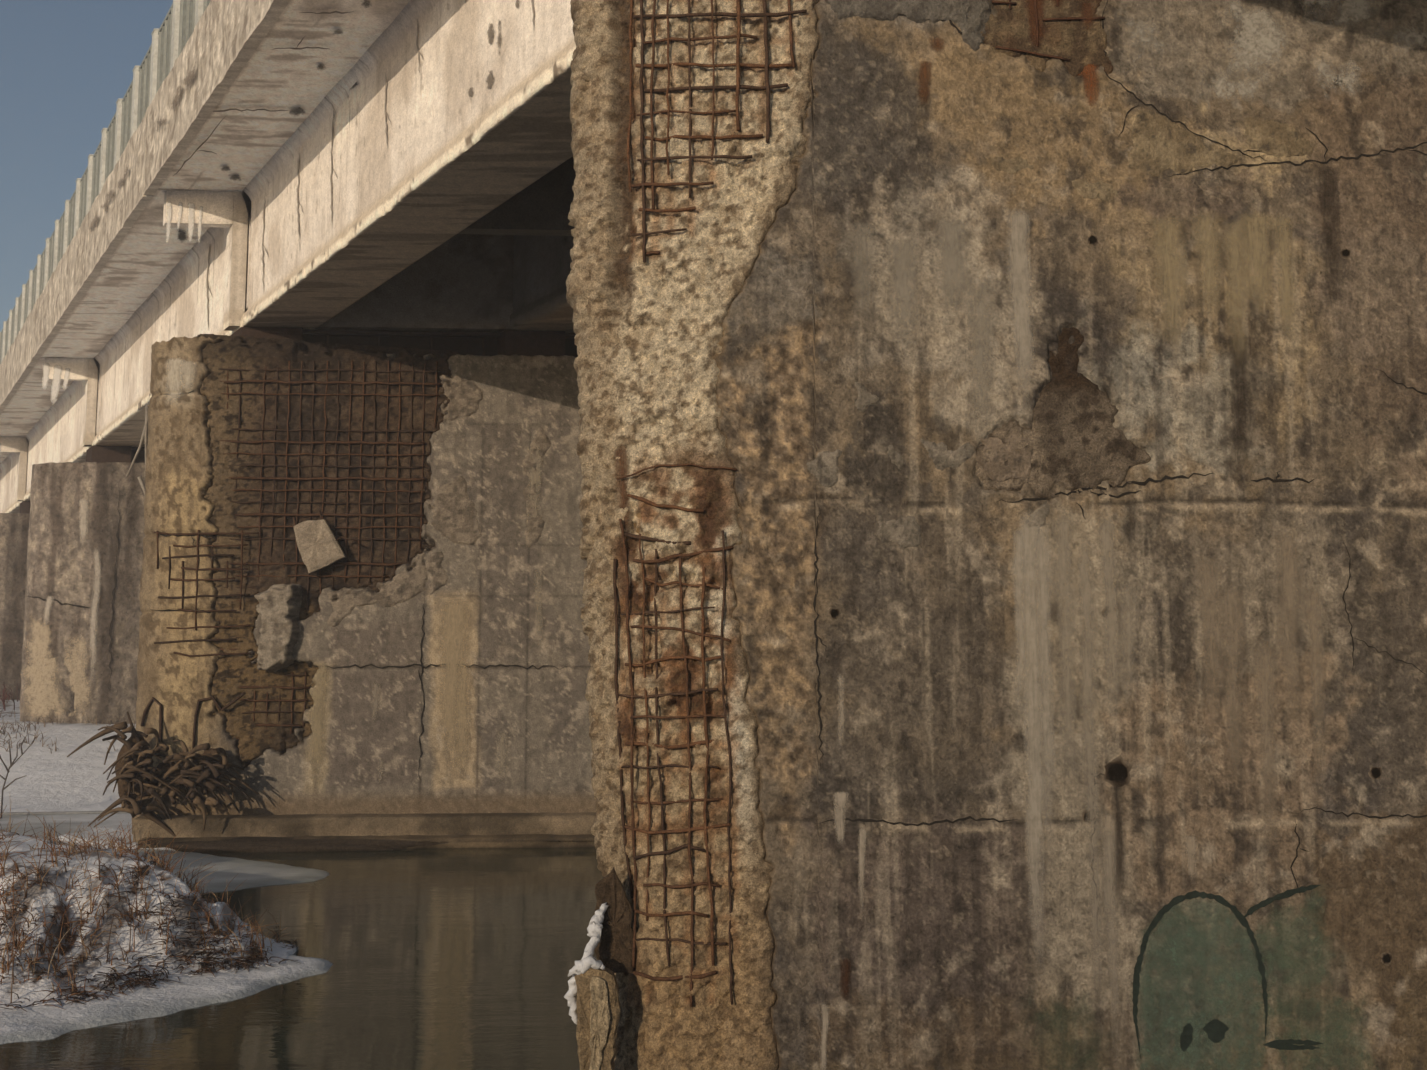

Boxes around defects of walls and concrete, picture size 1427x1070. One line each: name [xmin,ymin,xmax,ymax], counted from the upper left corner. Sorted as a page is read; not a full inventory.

crack [1102,0,1427,177]
crack [205,244,213,326]
crack [262,110,338,292]
leakage [1009,213,1032,380]
spalling [154,334,483,767]
rust [615,447,629,551]
spalling [566,0,1118,1070]
spalling [920,327,1151,528]
crack [997,473,1212,520]
spalling [140,697,162,743]
leakage [835,792,846,839]
leakage [1015,519,1133,1014]